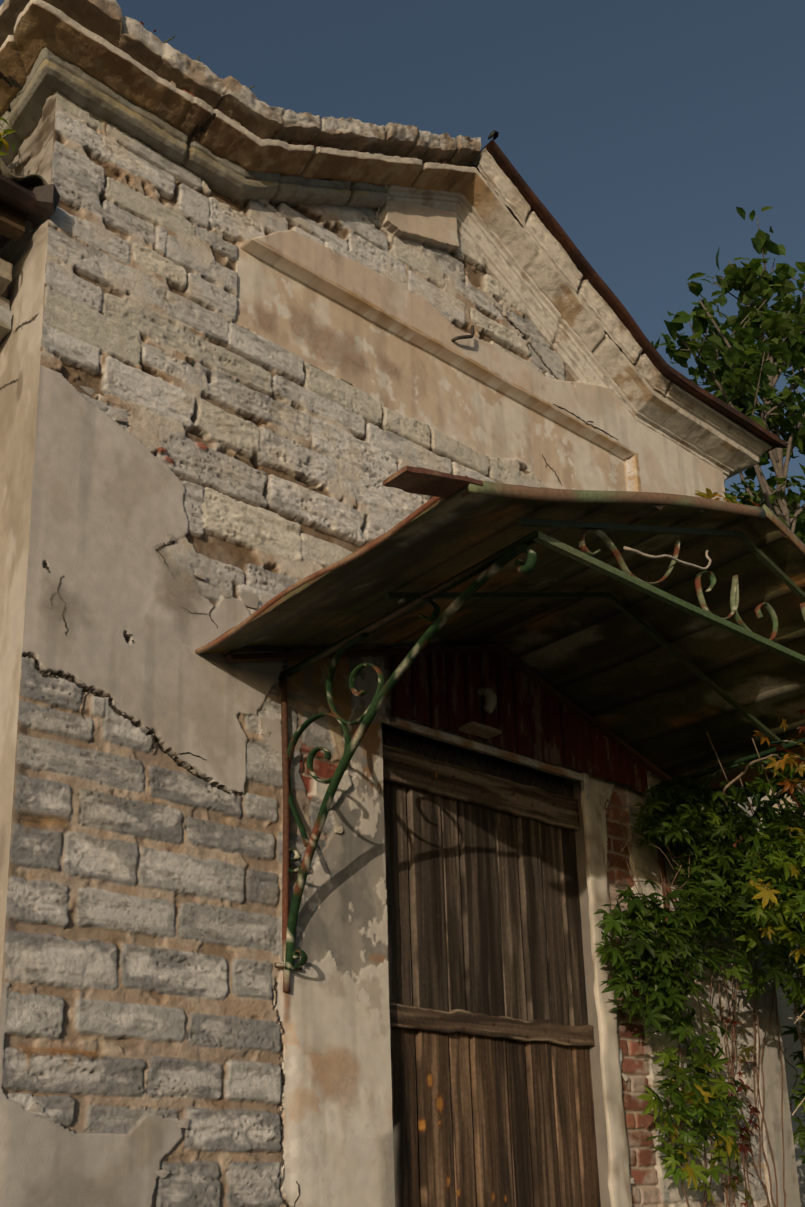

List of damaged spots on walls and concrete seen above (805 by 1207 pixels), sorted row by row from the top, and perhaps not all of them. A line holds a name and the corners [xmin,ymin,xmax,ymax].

flaking render [40,91,588,615]
flaking render [627,454,639,492]
crack [43,560,68,634]
crack [22,652,243,796]
flaking render [2,647,358,1207]
crack [274,981,300,1207]